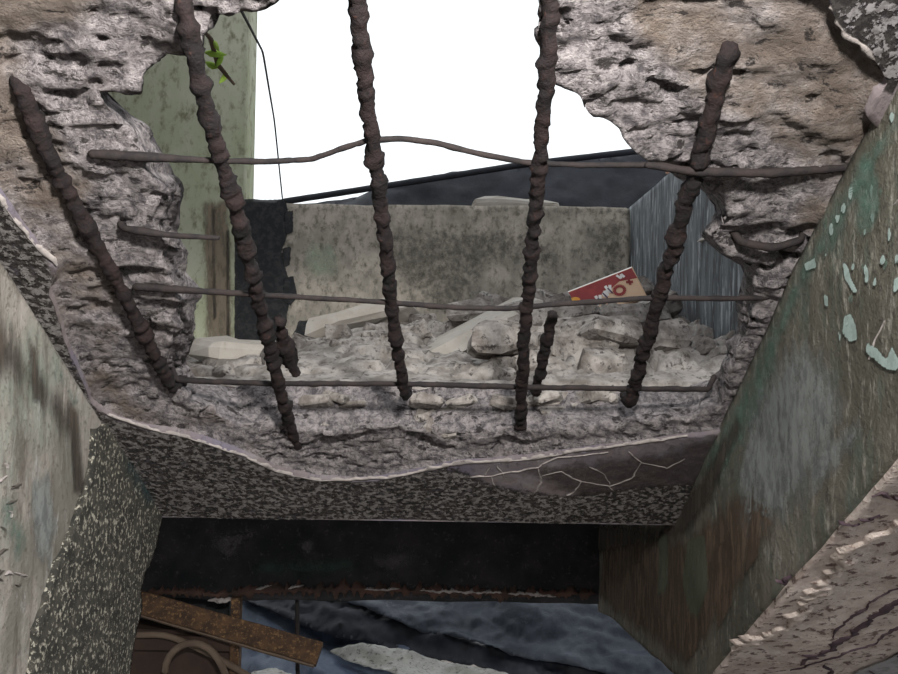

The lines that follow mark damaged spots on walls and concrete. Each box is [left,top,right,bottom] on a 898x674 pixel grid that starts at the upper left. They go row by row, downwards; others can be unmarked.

spalling [0,0,884,482]
peeling [866,343,898,371]
crack [790,588,898,671]